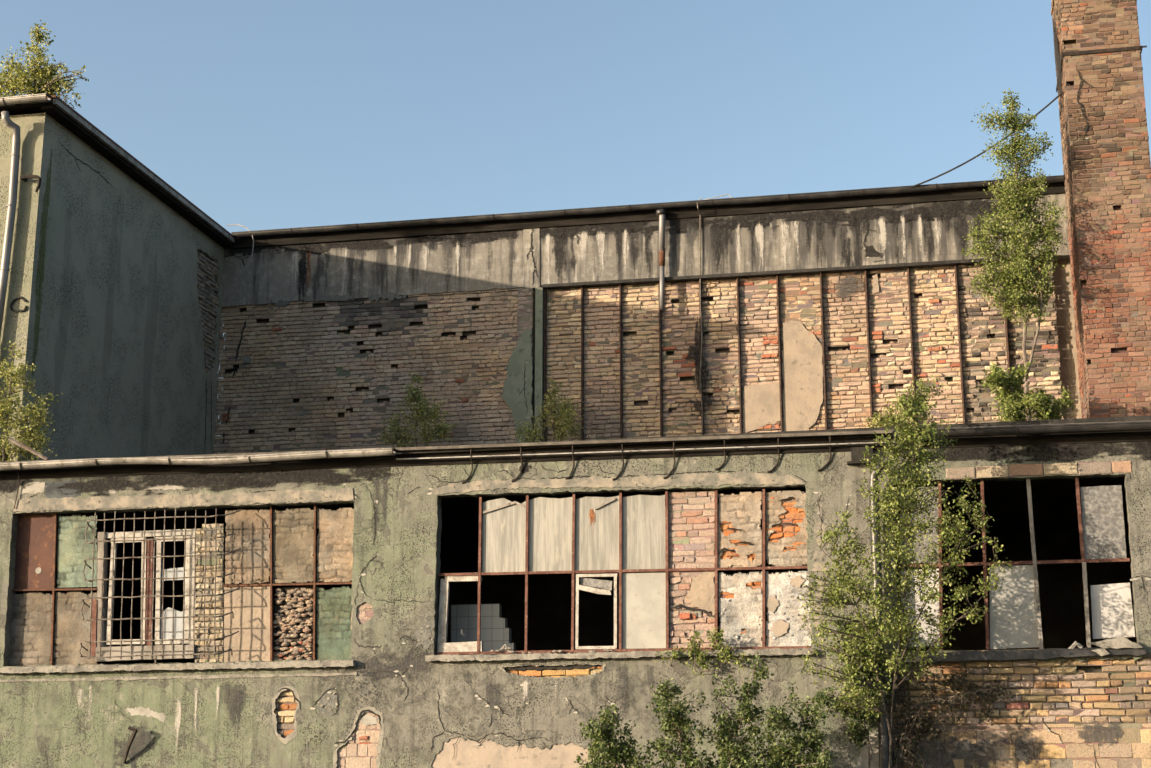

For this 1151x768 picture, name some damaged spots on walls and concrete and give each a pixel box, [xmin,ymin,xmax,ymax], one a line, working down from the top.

water stain [292,246,330,299]
water stain [342,240,471,294]
water stain [545,228,653,282]
water stain [669,226,696,270]
water stain [710,209,985,273]
crack [342,483,419,605]
spalling [272,686,301,744]
spalling [333,706,385,768]
crack [431,684,553,760]
peeling [431,737,625,768]
spalling [856,648,1151,768]